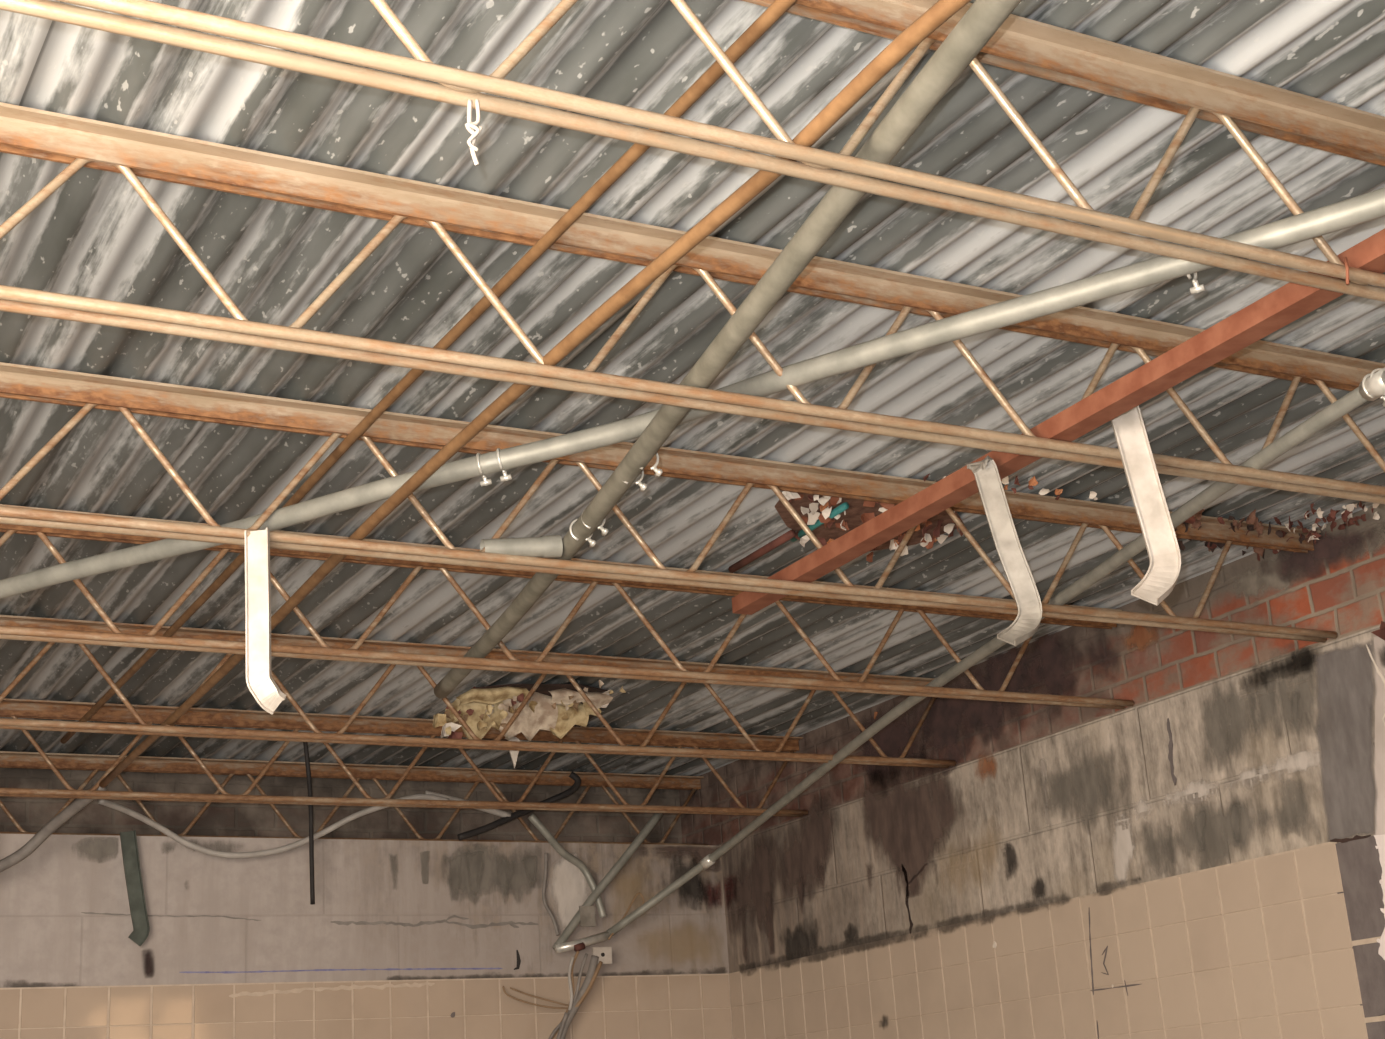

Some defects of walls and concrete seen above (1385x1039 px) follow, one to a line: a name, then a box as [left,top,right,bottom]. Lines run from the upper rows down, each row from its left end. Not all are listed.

damp [642,800,1068,974]
damp [863,767,957,896]
crack [901,863,927,934]
peeling [1317,643,1385,1039]